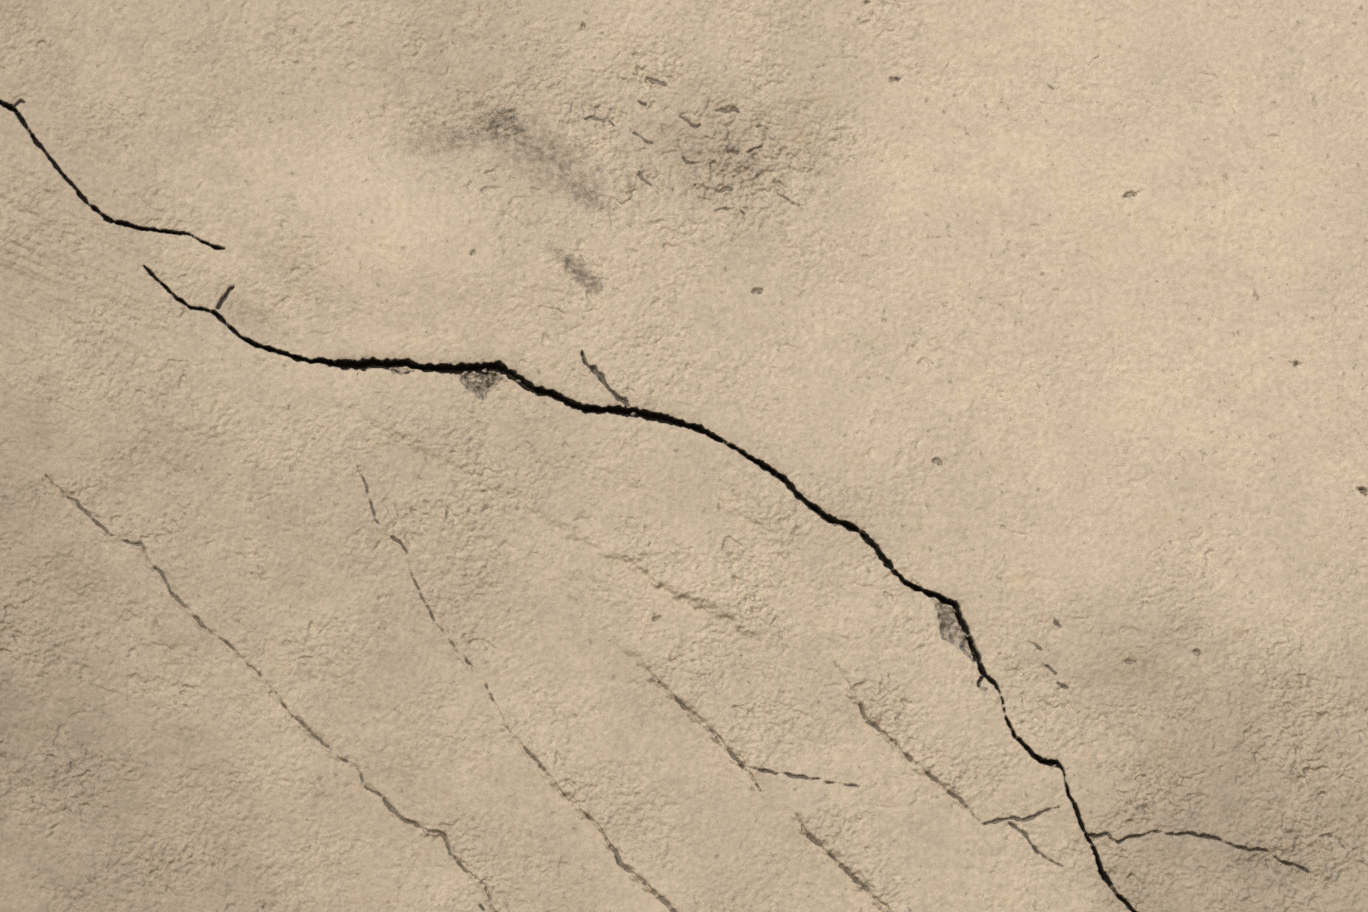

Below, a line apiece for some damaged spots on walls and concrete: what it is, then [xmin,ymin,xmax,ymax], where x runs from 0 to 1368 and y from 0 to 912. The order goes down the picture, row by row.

crack [0,99,225,250]
crack [45,475,491,911]
crack [144,266,1309,912]